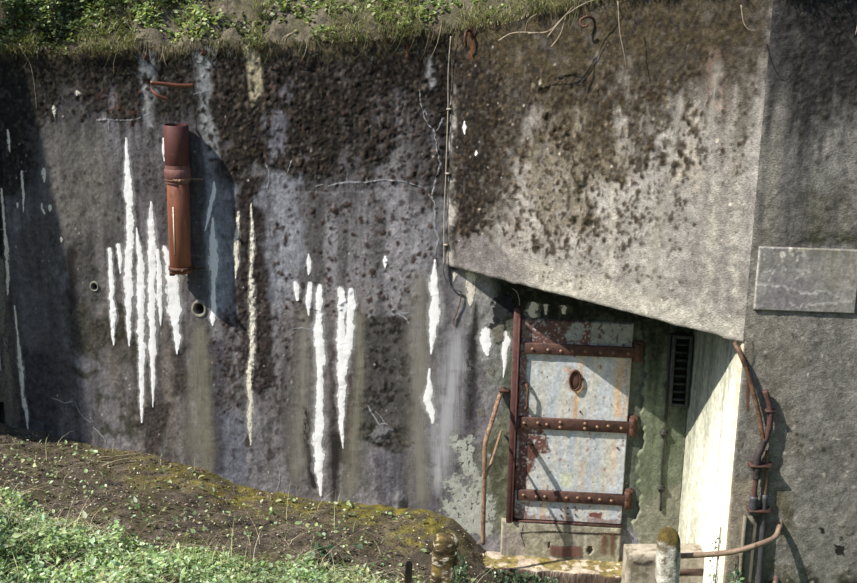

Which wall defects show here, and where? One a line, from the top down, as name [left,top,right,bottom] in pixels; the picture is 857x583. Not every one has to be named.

leakage [108,138,182,423]
leakage [189,181,219,468]
leakage [232,203,256,445]
leakage [290,254,364,502]
leakage [412,259,511,508]
peeling [439,429,496,536]